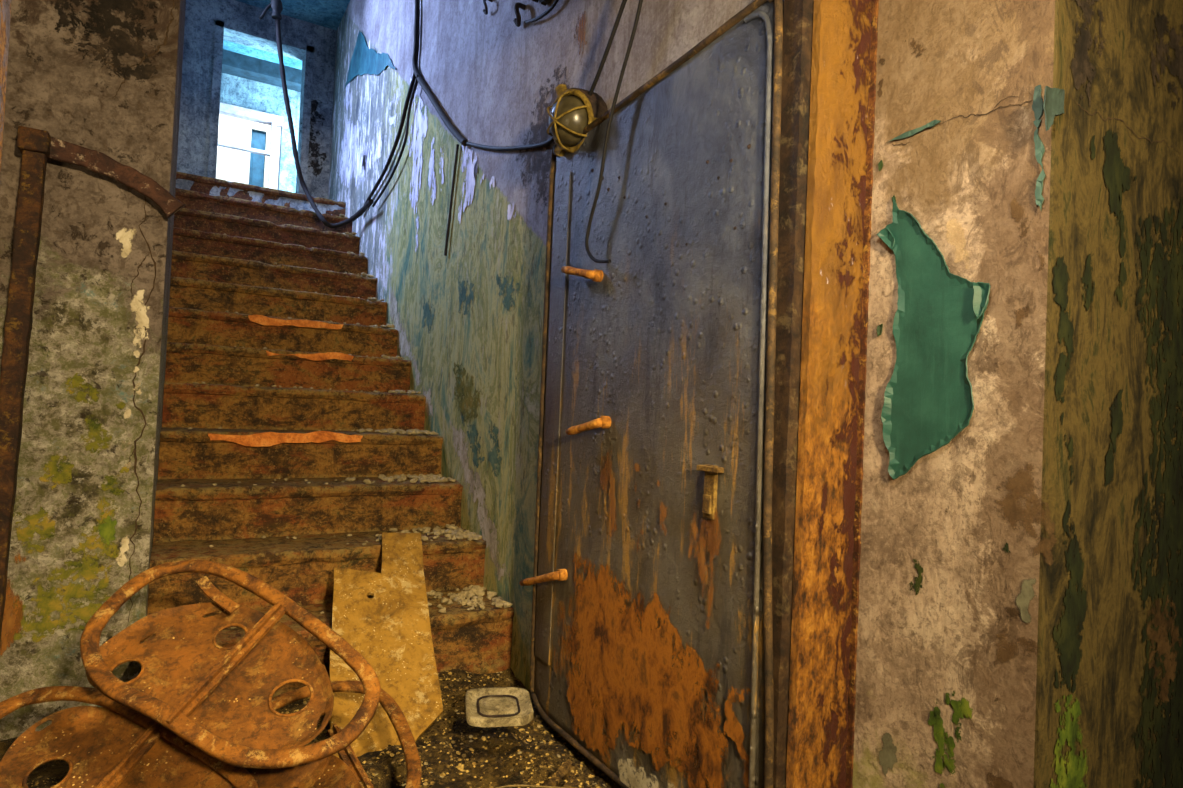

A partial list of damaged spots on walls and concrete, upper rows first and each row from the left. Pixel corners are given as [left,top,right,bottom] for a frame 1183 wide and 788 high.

water stain [516,64,570,213]
spalling [1010,85,1065,241]
peeling [876,195,991,480]
spalling [1014,302,1030,327]
water stain [1053,252,1095,485]
water stain [1105,389,1124,487]
rust [554,552,751,788]
rust [688,508,721,629]
water stain [928,691,973,788]
spalling [994,607,1039,665]
spalling [995,463,1057,565]
water stain [1053,501,1088,693]